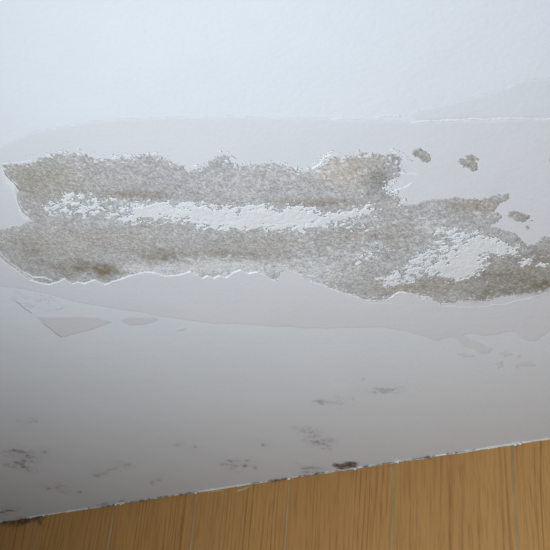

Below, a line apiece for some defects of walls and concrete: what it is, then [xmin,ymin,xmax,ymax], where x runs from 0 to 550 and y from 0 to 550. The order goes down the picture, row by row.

flaking render [0,115,550,370]